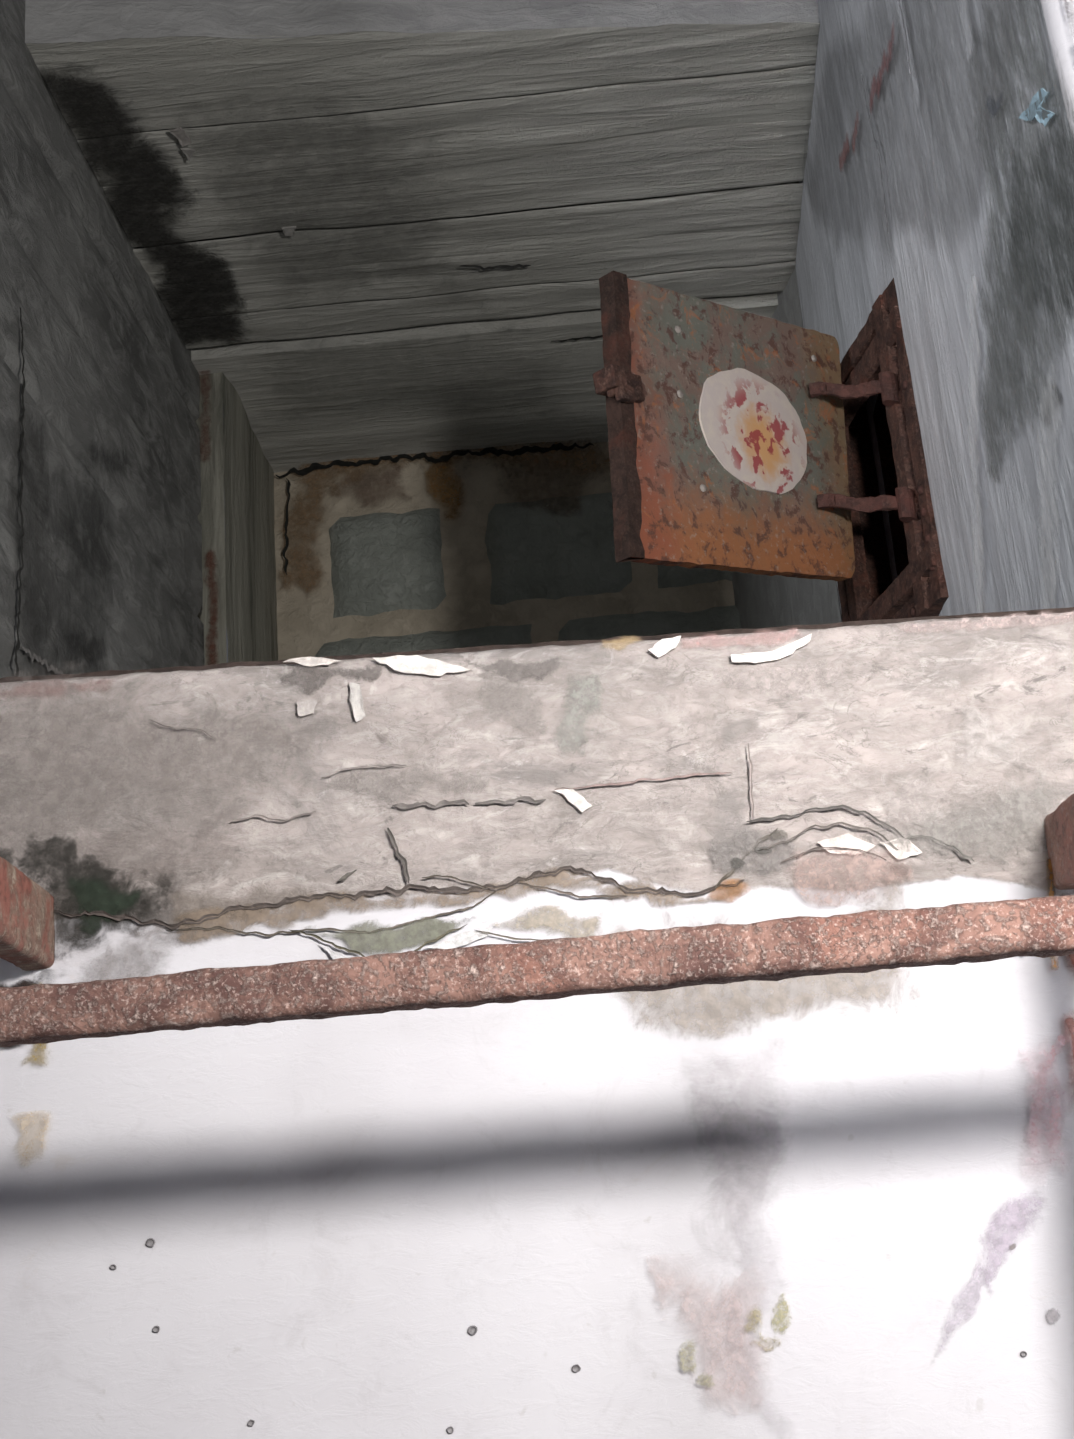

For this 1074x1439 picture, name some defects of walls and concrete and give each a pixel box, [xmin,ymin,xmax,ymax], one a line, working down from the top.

water stain [964,0,1074,608]
water stain [0,693,313,982]
peeling [290,906,599,959]
crack [54,743,974,942]
water stain [628,968,899,1035]
corrosion [1048,859,1073,896]